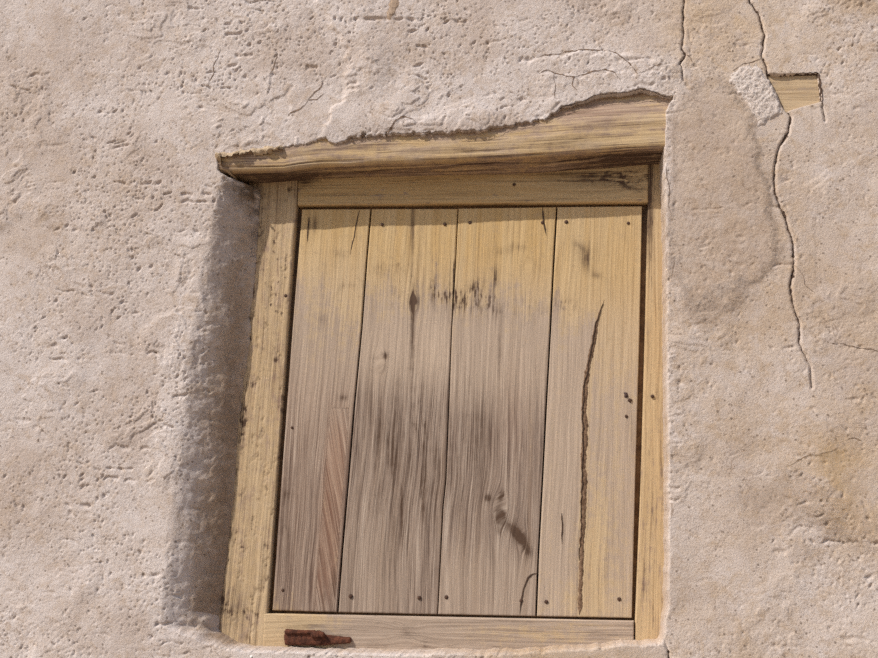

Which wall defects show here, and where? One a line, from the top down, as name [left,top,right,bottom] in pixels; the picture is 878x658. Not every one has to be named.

crack [336,0,692,143]
spalling [215,145,285,181]
crack [737,0,825,384]